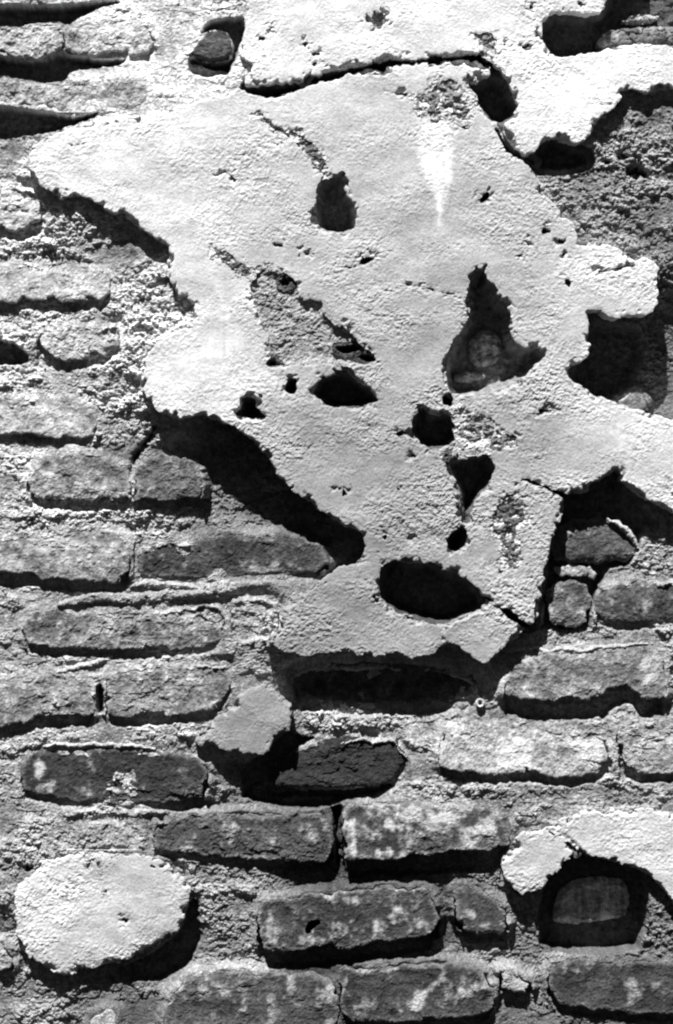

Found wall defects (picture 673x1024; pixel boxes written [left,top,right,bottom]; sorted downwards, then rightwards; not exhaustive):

crack [240,53,499,98]
peeling [29,0,673,664]
peeling [195,681,293,755]
peeling [13,851,191,975]
peeling [501,807,673,904]
flaking render [552,874,629,924]